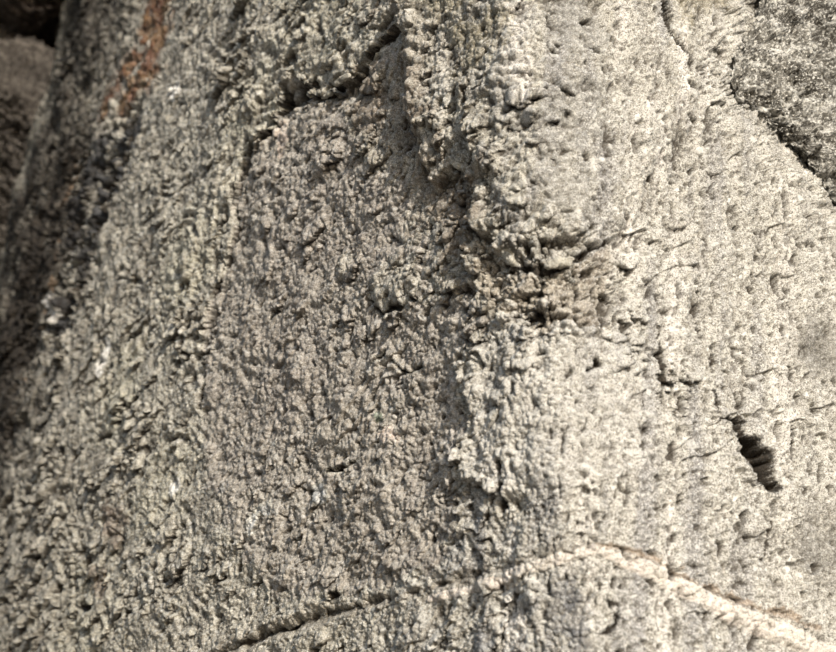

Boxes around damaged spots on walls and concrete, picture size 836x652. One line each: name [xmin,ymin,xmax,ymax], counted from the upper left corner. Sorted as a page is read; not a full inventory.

rust [91,0,180,140]
crack [641,309,797,498]
crack [489,457,510,516]
crack [759,518,775,564]
crack [122,601,147,620]
crack [597,599,624,637]
crack [335,642,374,652]